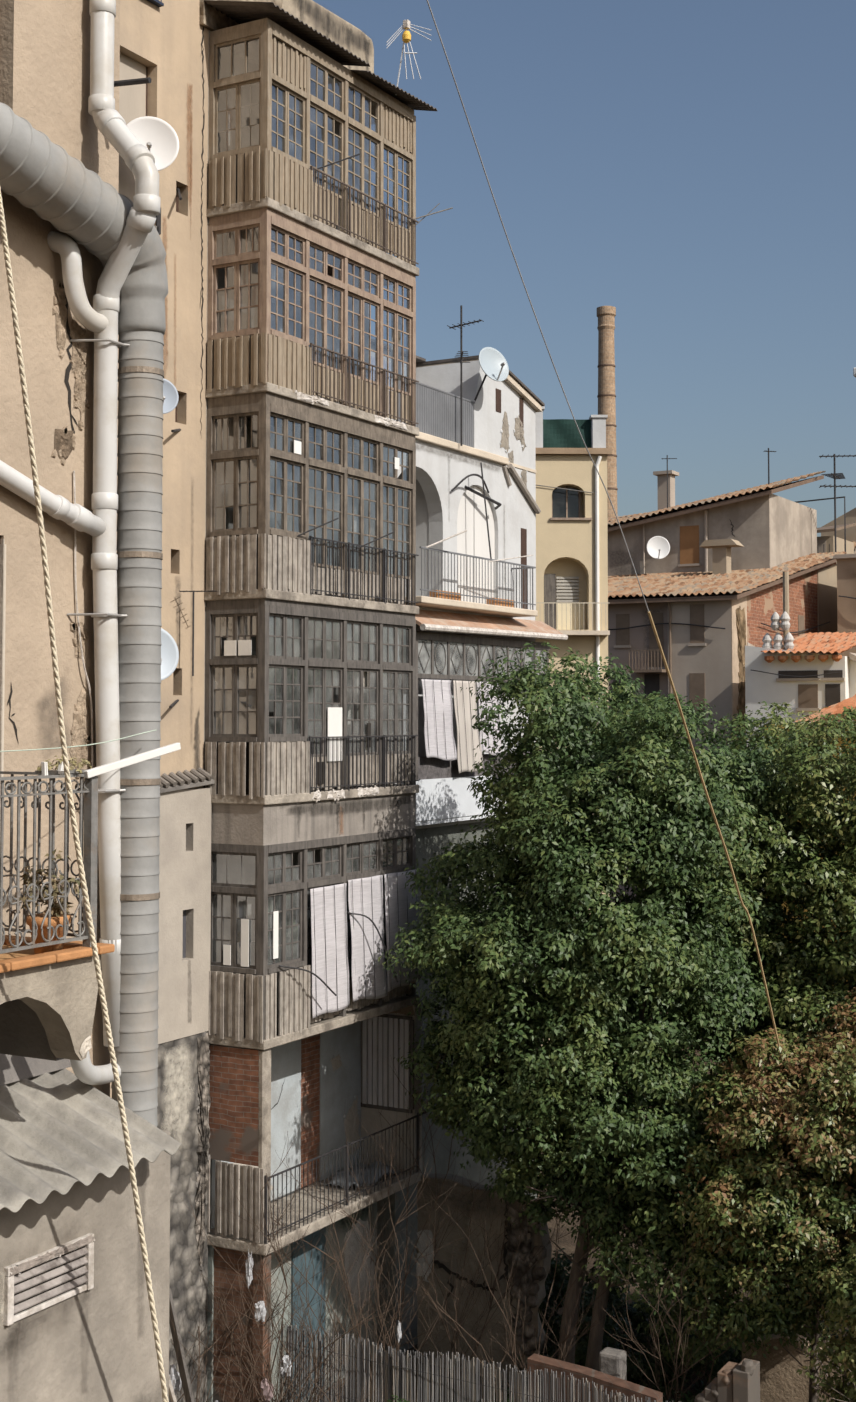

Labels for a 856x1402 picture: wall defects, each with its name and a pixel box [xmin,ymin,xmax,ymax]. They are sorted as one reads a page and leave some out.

flaking render [51,280,90,466]
crack [434,1202,516,1309]